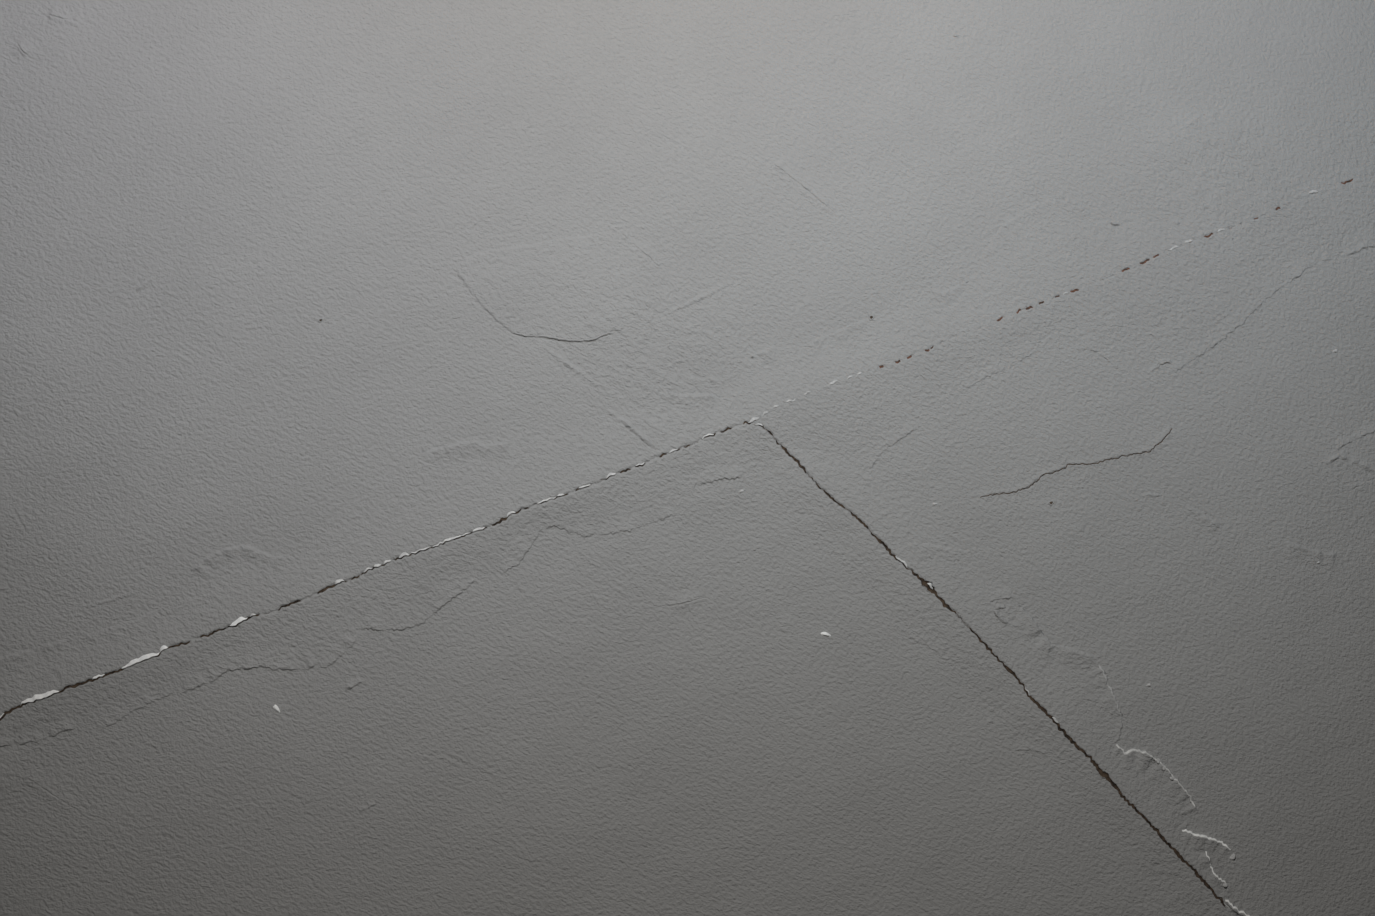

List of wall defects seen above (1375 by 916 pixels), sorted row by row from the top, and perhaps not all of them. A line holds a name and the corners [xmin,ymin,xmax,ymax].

crack [1122,179,1353,272]
crack [997,289,1079,321]
crack [0,336,1231,911]